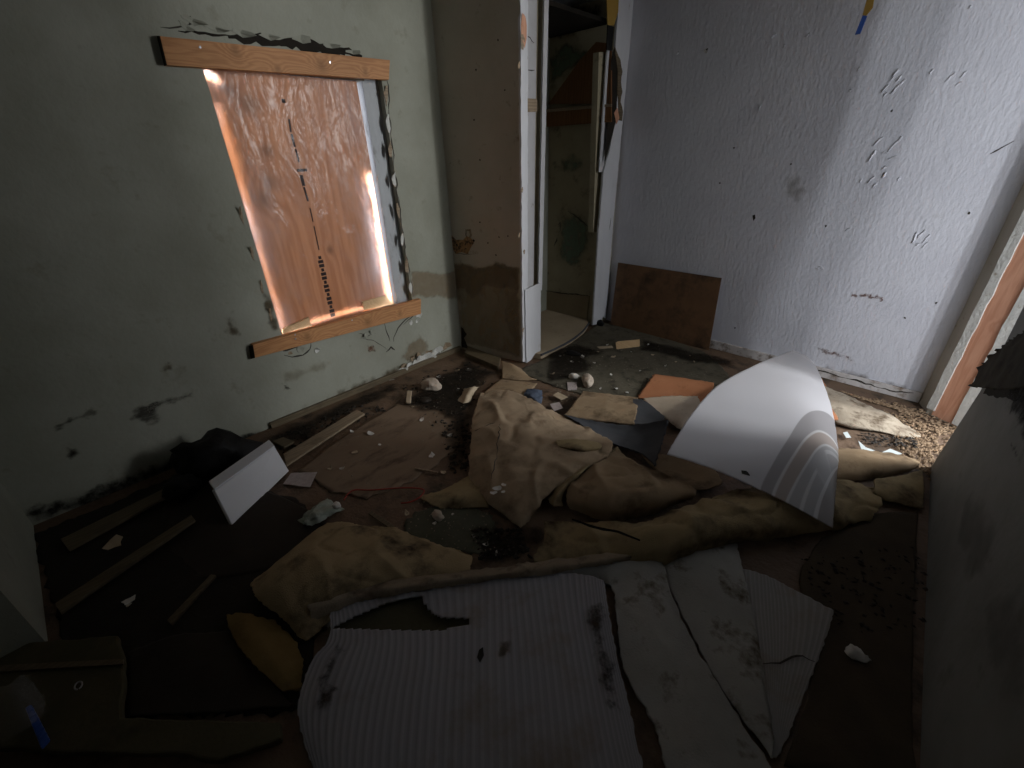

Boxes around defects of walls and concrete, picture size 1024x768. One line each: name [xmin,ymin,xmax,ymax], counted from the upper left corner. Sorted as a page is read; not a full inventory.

peeling [162,14,361,55]
spalling [383,81,413,294]
damp [412,264,521,356]